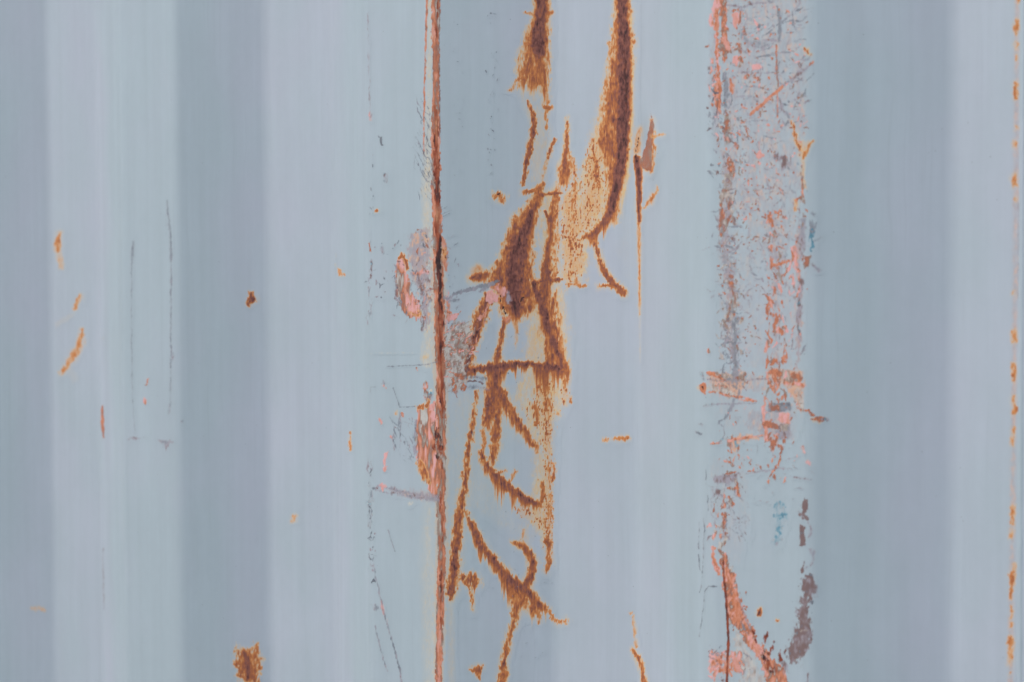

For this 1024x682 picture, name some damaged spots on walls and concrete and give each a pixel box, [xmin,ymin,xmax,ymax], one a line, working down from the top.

rust [49,225,68,273]
rust [53,289,107,385]
rust [243,286,262,311]
peeling [363,0,470,682]
rust [444,0,662,682]
peeling [701,0,825,486]
rust [1001,0,1024,682]
rust [226,635,271,682]
peeling [705,510,791,682]